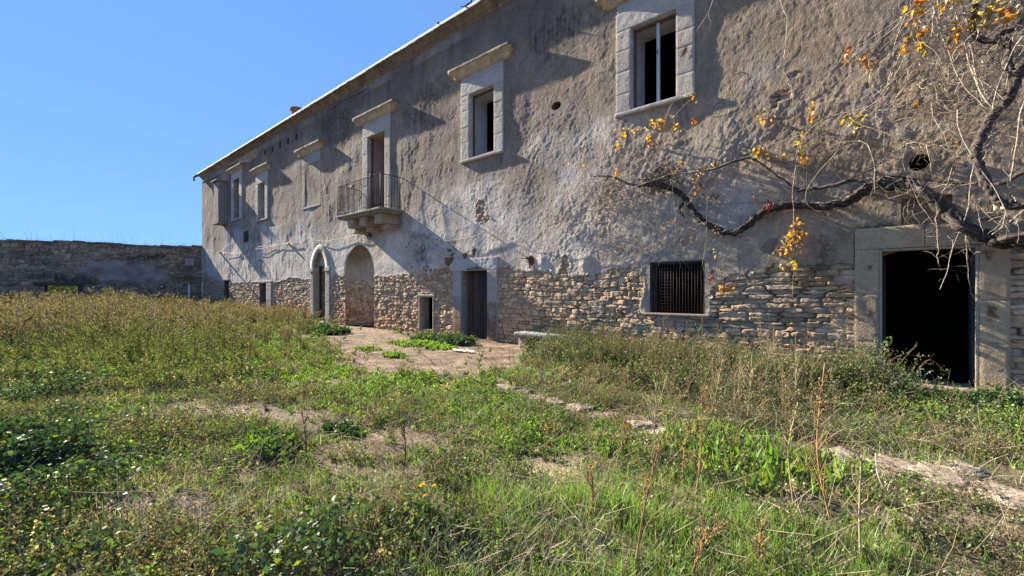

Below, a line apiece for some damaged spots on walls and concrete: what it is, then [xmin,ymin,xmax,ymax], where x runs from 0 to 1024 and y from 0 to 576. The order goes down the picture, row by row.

flaking render [474,199,491,224]
flaking render [330,247,477,335]
flaking render [498,238,855,367]